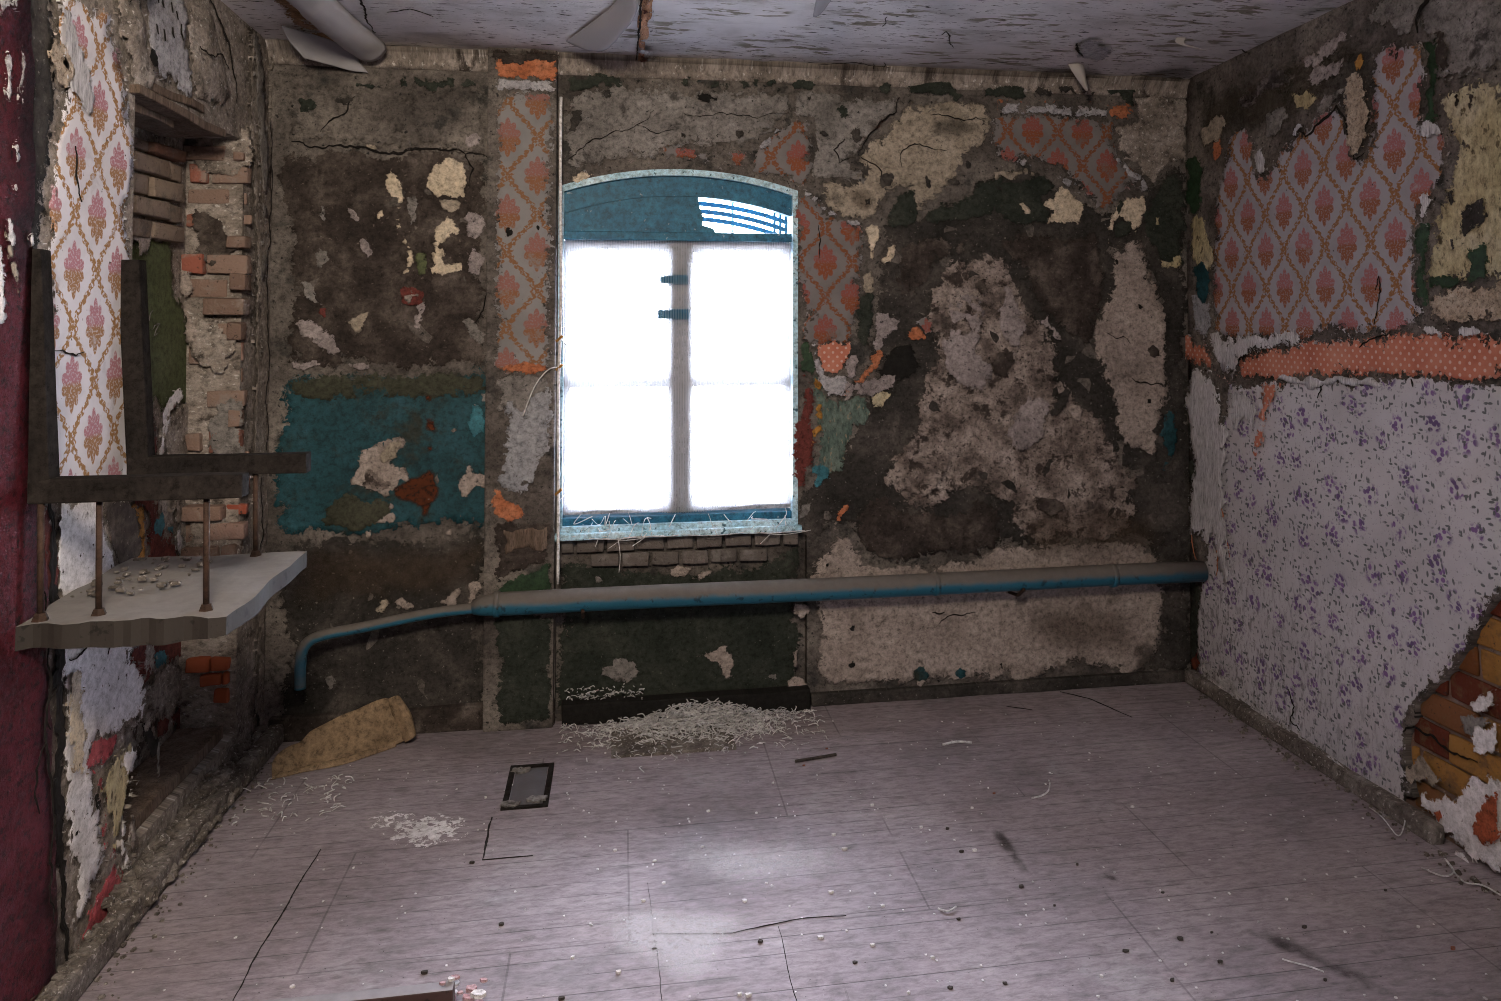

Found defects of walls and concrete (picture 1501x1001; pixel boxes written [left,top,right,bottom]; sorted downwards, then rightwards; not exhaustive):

flaking render [0,0,58,324]
peeling [144,0,193,98]
peeling [1238,32,1364,138]
peeling [1367,0,1501,326]
flaking render [44,30,1228,726]
peeling [61,642,231,949]
flaking render [1403,601,1501,873]